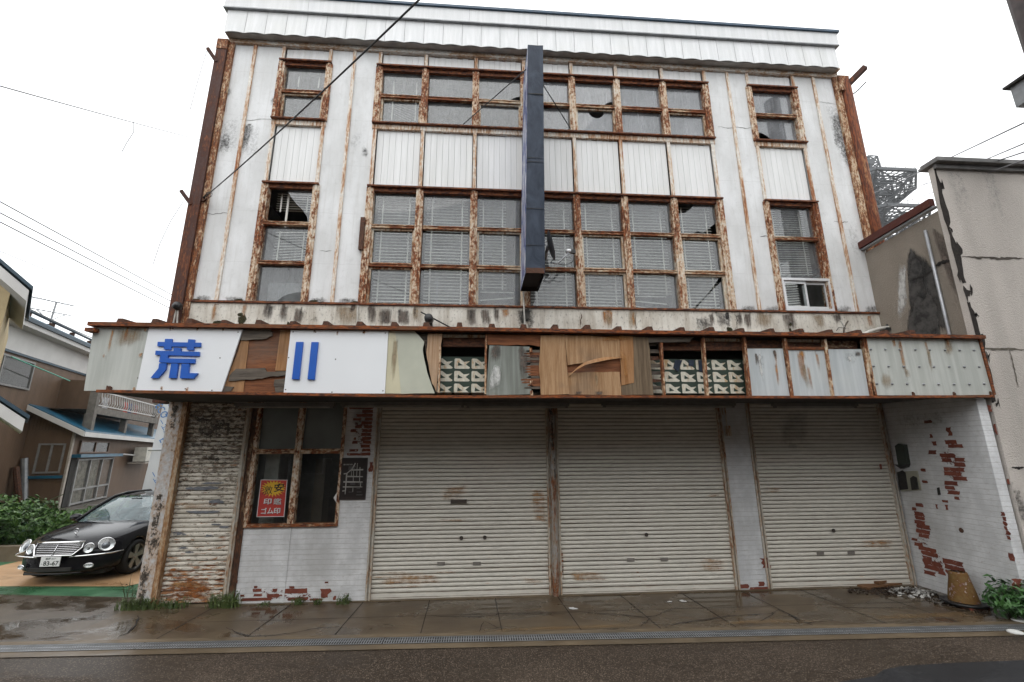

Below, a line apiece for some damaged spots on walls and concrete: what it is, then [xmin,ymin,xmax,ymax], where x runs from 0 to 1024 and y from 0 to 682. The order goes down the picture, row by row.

damp [898,229,955,334]
damp [368,306,418,323]
damp [467,308,498,324]
damp [518,308,533,327]
peeling [347,407,373,472]
peeling [911,420,968,577]
peeling [240,582,336,601]